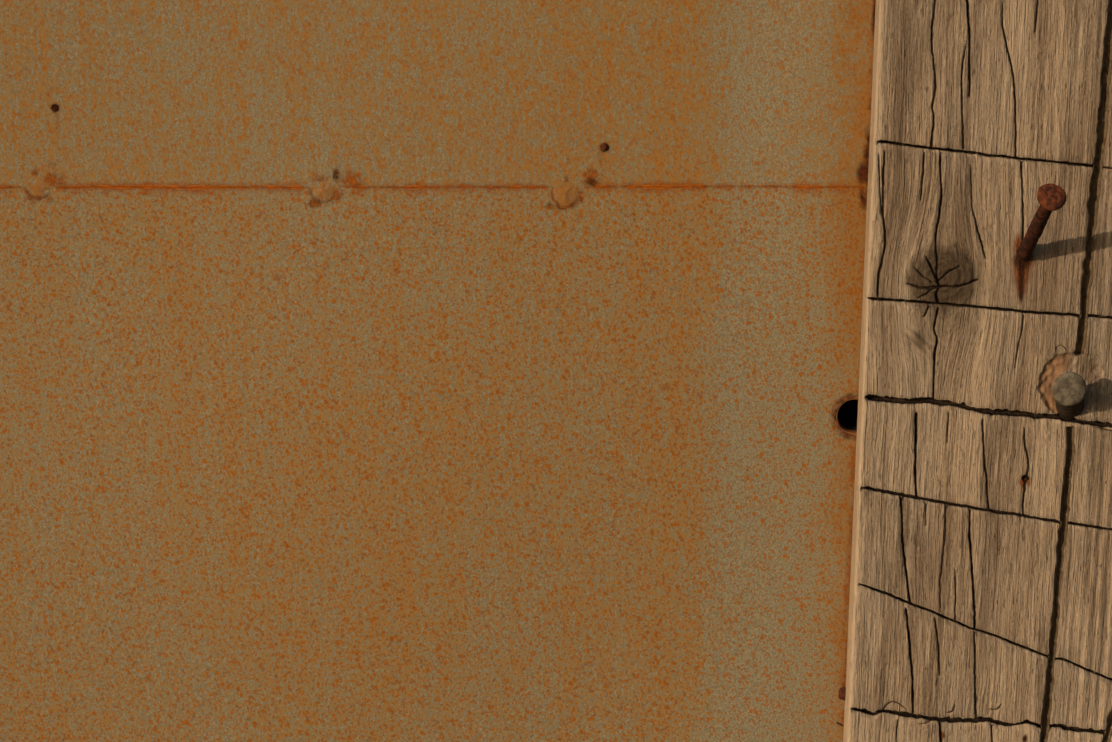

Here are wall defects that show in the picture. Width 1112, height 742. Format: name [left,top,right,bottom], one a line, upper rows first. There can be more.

crack [1002,4,1024,239]
rust [58,183,303,191]
rust [769,135,870,206]
crack [877,152,886,296]
rust [1014,235,1032,300]
crack [896,0,993,742]
crack [1021,428,1029,515]
rust [838,647,847,700]